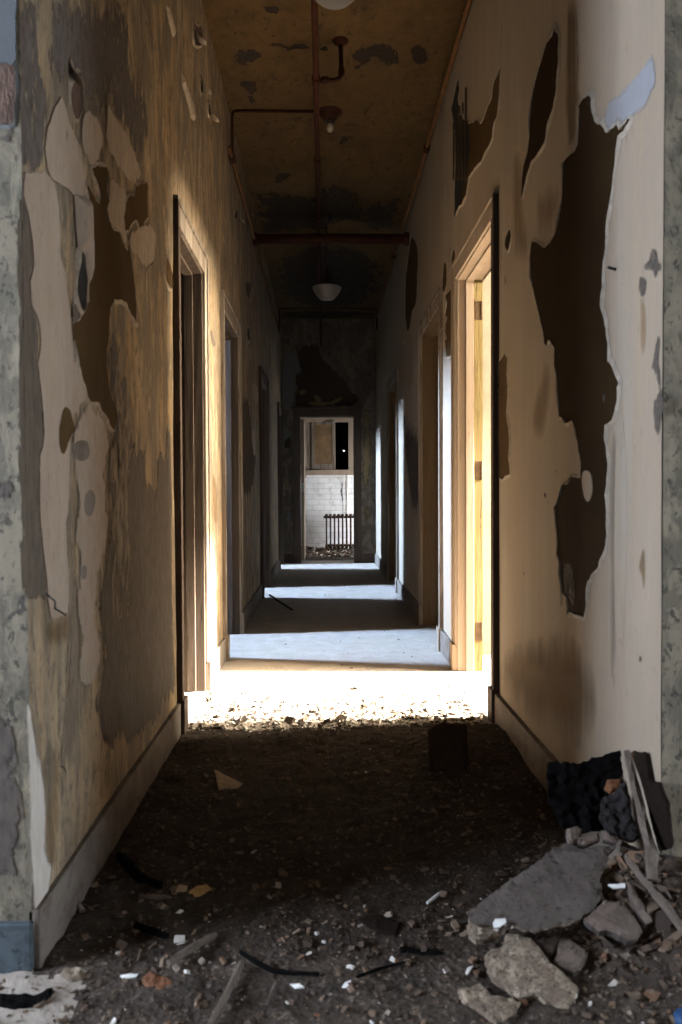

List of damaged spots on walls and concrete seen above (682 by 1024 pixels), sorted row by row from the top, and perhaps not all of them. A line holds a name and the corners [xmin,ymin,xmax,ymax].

damp [256,173,401,233]
peeling [451,63,502,219]
peeling [521,20,561,201]
peeling [0,0,174,686]
peeling [529,60,655,621]
peeling [27,705,51,909]